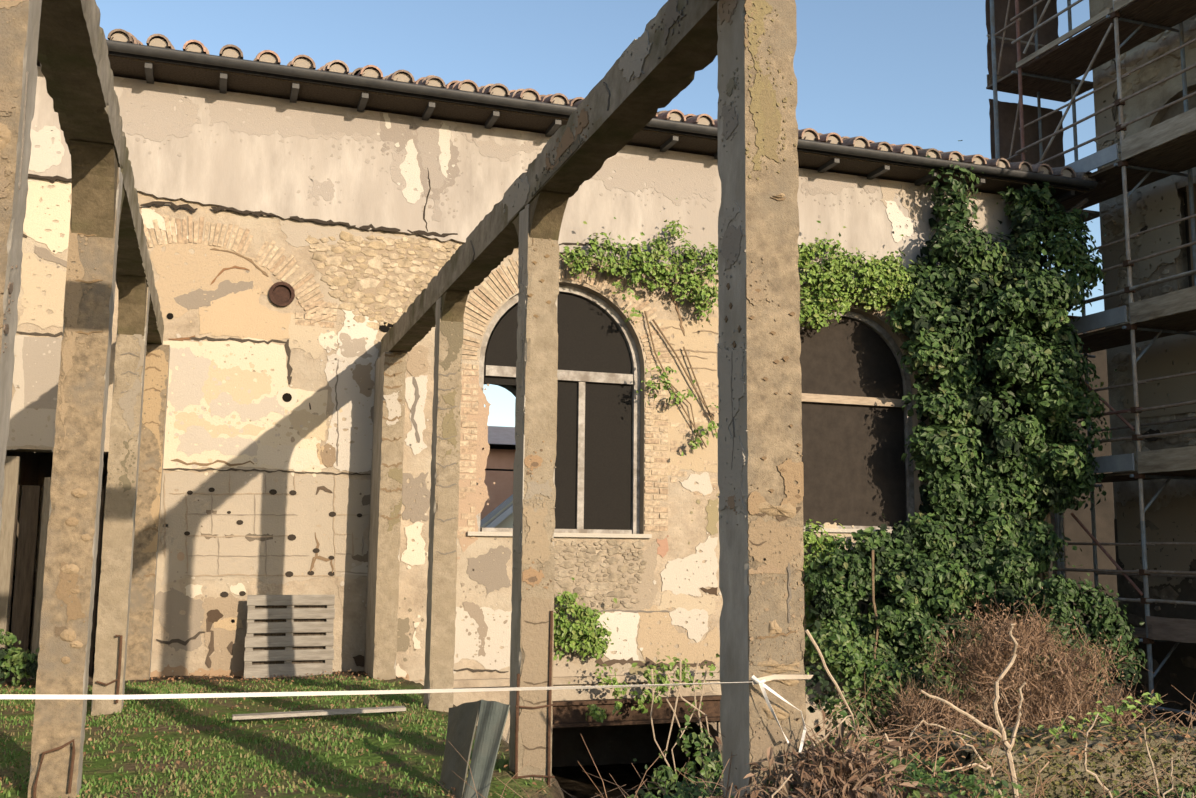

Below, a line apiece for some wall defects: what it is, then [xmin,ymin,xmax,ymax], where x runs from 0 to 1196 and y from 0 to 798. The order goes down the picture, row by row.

crack [140,168,475,263]
peeling [879,179,928,243]
spalling [141,206,461,677]
flaking render [454,369,722,788]